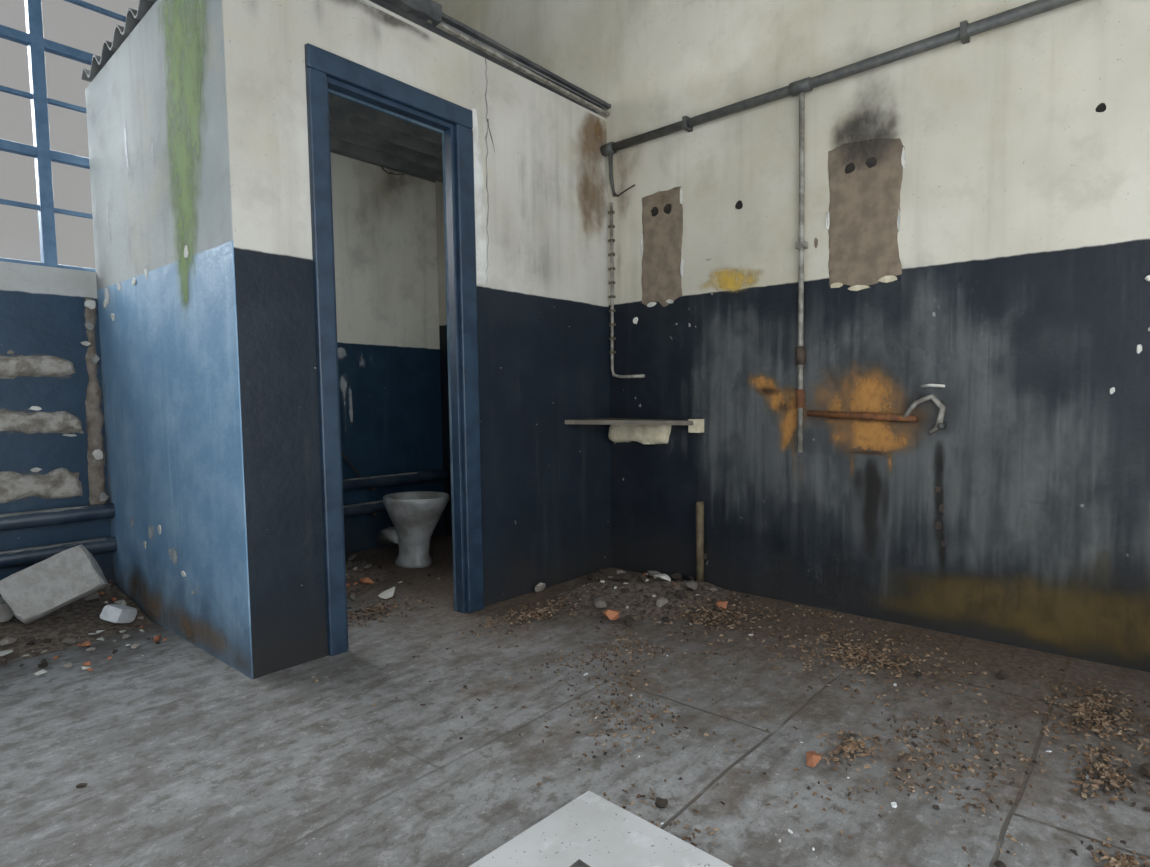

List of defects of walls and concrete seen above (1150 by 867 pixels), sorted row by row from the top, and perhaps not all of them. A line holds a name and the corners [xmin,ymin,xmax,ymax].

damp [580,114,607,220]
rust [751,375,805,450]
rust [816,374,910,468]
damp [897,447,1150,654]